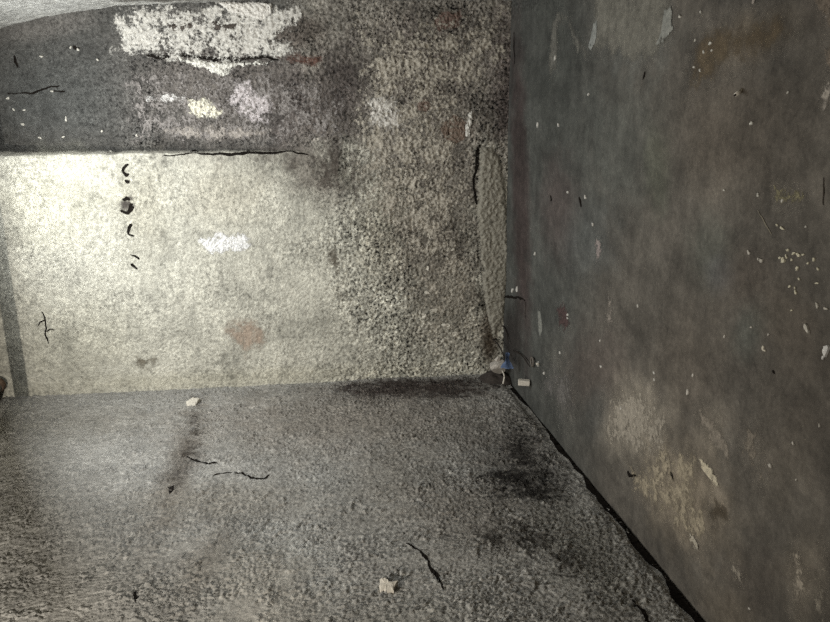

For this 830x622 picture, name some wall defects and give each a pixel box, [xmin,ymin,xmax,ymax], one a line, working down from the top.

flaking render [116,66,347,144]
damp [365,94,402,129]
crack [164,148,308,156]
flaking render [350,2,518,342]
crack [472,144,481,205]
crack [510,388,703,622]
crack [406,543,444,590]